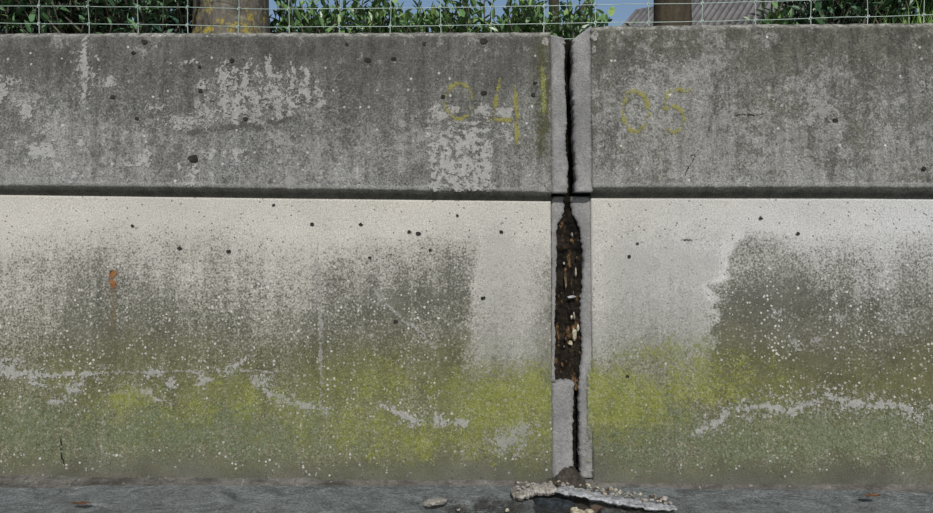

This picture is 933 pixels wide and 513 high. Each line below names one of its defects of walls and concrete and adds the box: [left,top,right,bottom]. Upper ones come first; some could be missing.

crack [554,40,582,470]
damp [0,259,331,419]
damp [376,397,470,429]
damp [482,420,540,457]
damp [691,385,933,439]